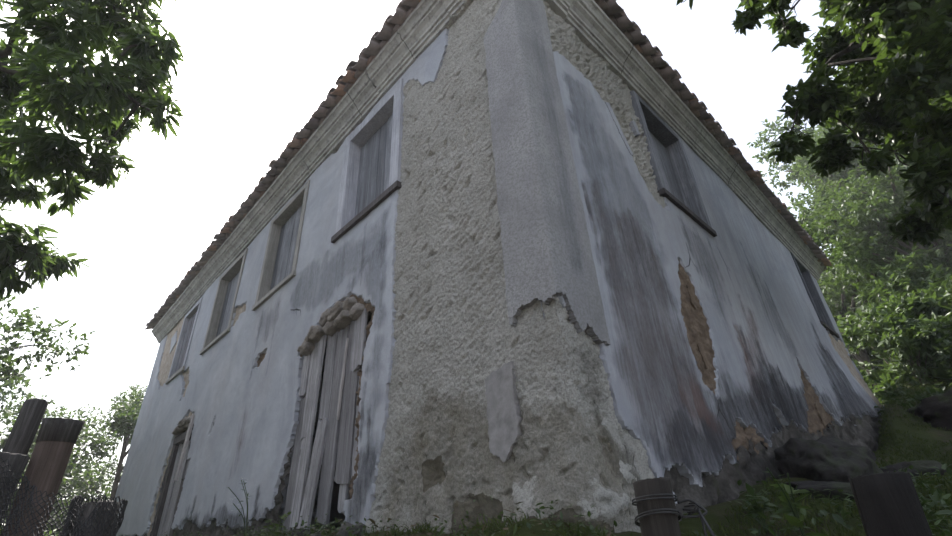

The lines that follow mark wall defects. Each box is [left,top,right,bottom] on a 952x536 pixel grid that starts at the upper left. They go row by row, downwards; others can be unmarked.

peeling [157,316,185,386]
flaking render [342,294,375,499]
flaking render [365,0,883,534]
damp [582,183,809,477]
damp [818,338,876,418]